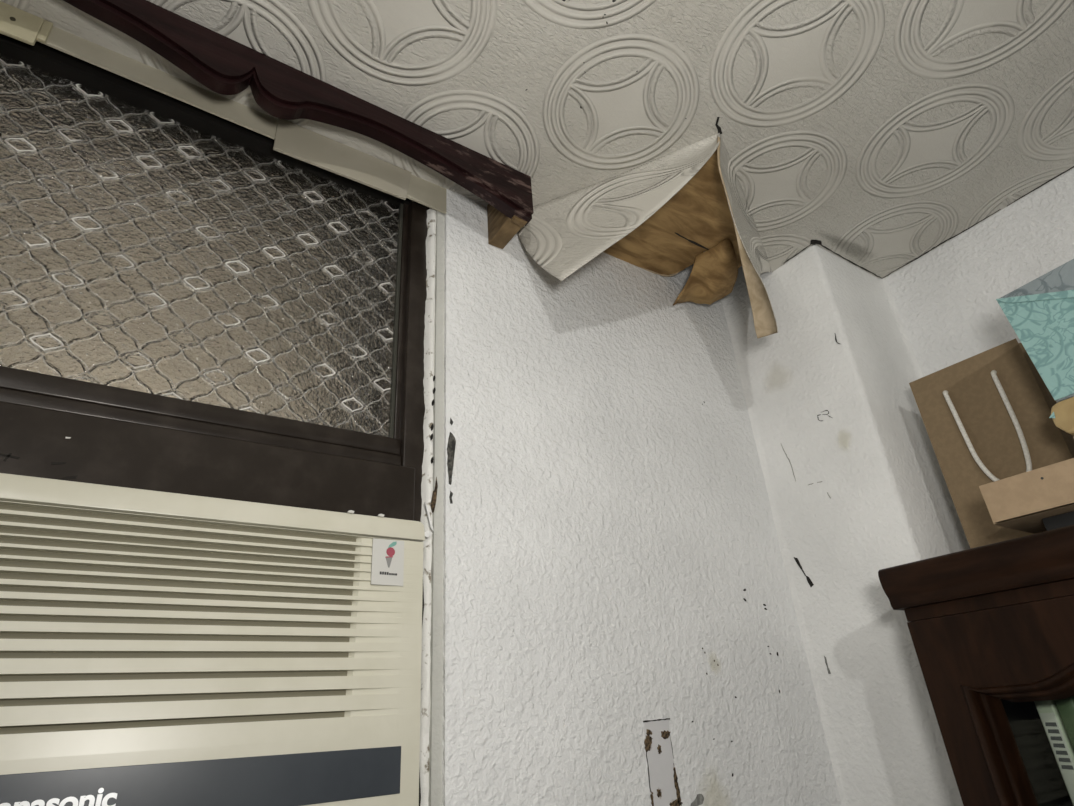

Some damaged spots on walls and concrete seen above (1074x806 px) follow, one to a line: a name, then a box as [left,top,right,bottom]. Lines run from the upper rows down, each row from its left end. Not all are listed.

peeling [518,117,778,338]
spalling [447,418,457,504]
corrosion [643,718,670,754]
corrosion [650,763,683,806]